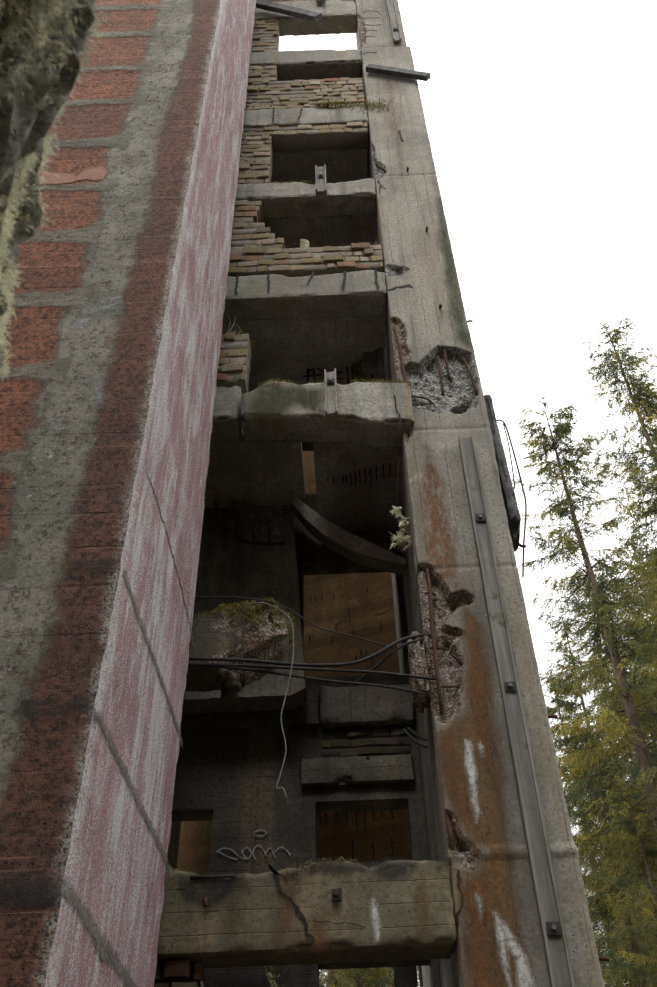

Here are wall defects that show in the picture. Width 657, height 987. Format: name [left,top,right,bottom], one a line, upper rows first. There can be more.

spalling [303,366,354,385]
spalling [371,317,480,414]
rust [424,463,456,583]
spalling [417,562,475,723]
spalling [444,810,481,869]
rust [440,609,525,987]
crack [267,863,364,947]